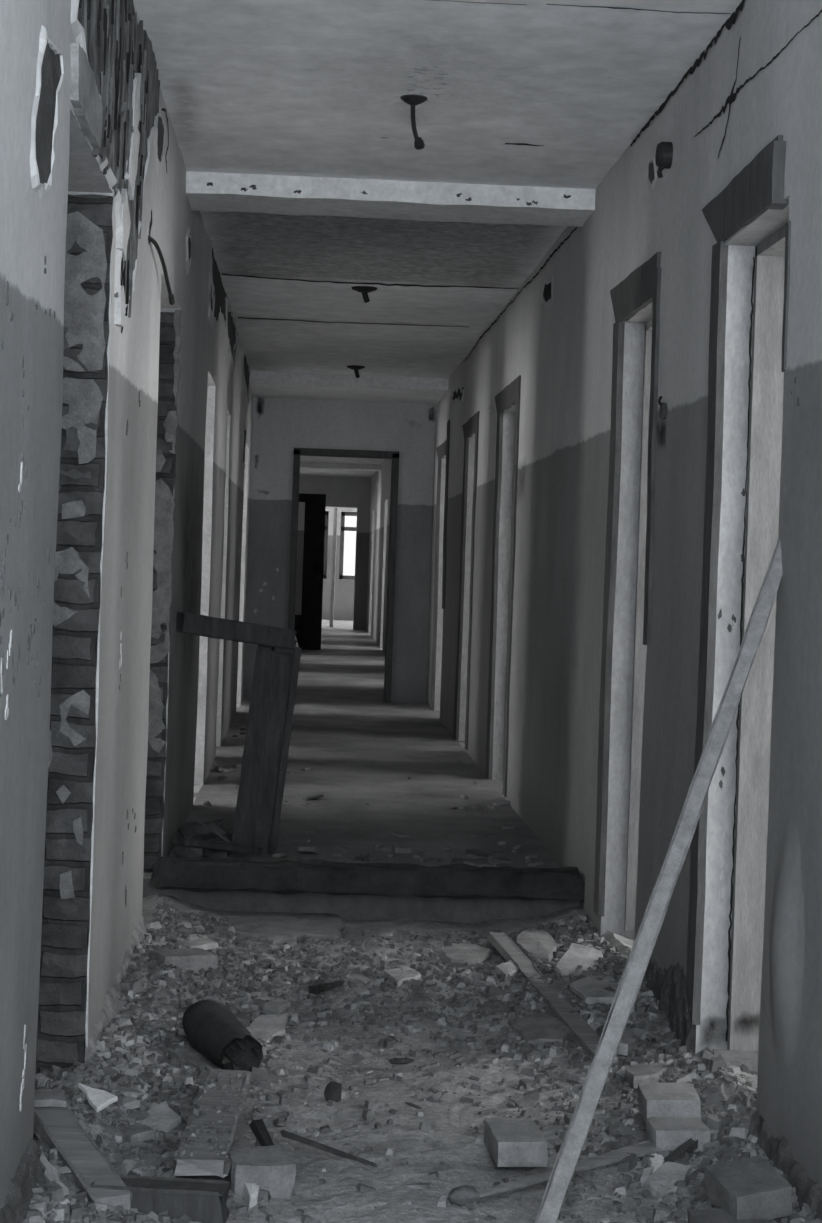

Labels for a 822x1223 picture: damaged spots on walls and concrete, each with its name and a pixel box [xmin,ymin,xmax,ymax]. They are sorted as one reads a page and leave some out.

crack [433,0,822,158]
flaking render [0,0,165,1112]
flaking render [126,310,182,873]